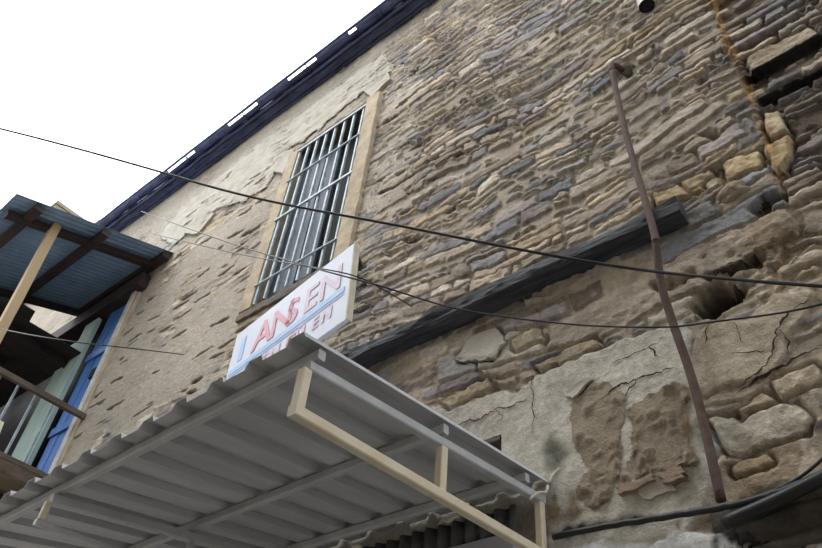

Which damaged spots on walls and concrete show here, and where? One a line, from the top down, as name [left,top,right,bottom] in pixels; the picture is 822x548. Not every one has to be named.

peeling [160,54,395,250]
crack [459,371,535,428]
crack [578,343,674,400]
flaking render [564,377,699,510]
crack [731,300,821,393]